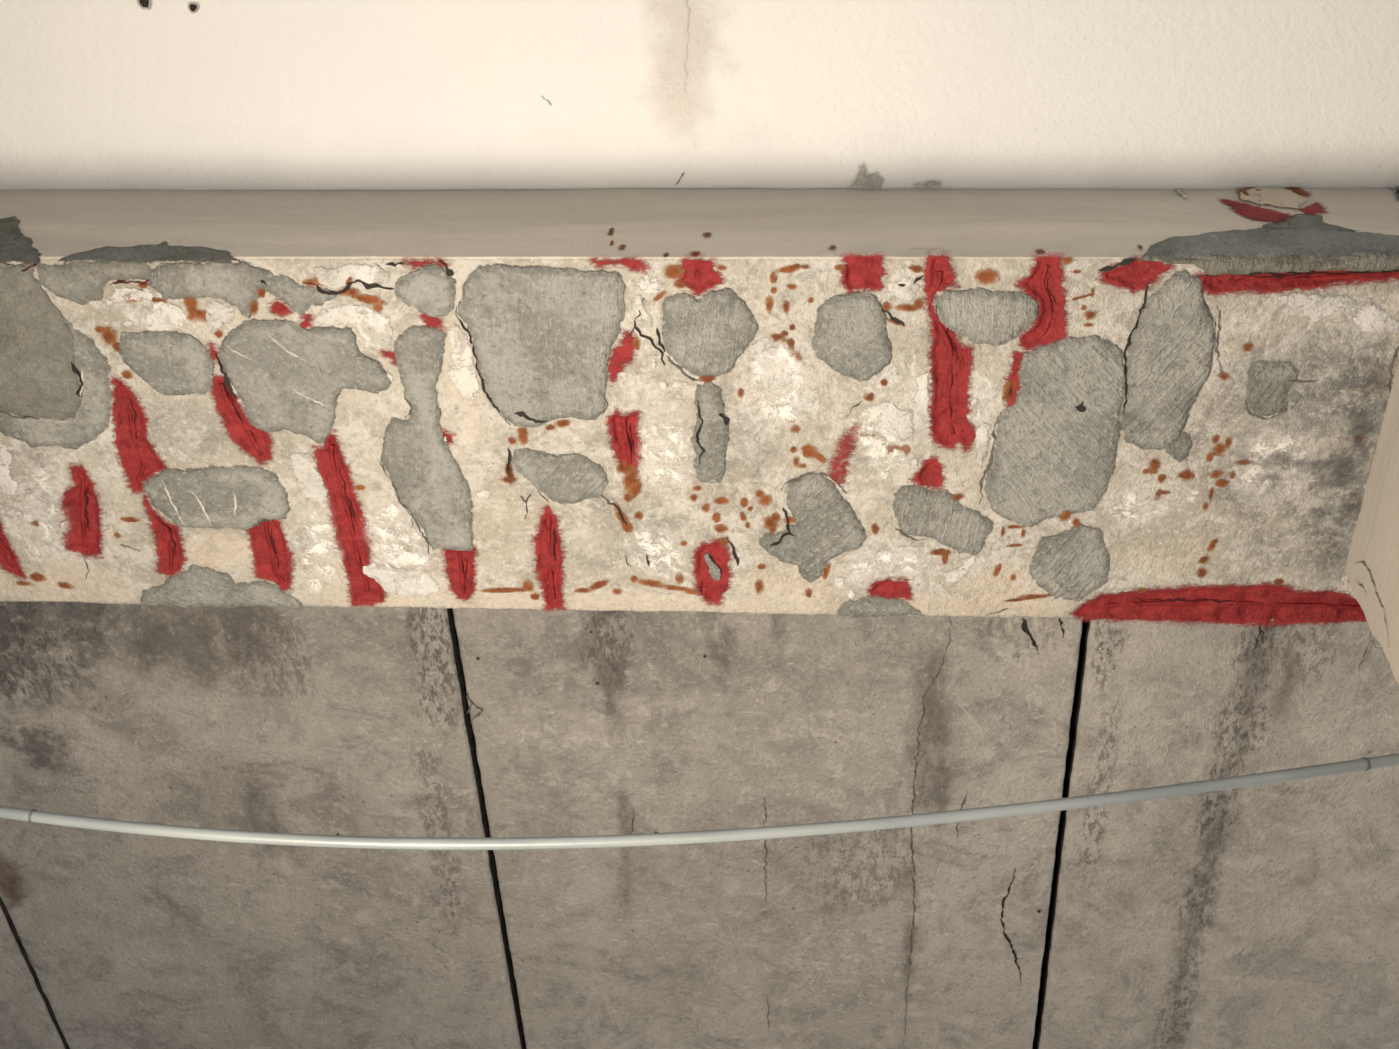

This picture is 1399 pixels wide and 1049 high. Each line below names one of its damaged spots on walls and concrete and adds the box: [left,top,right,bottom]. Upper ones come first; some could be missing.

crack [303,263,403,295]
peeling [313,263,393,350]
crack [438,261,454,276]
peeling [447,323,481,415]
peeling [290,449,328,503]
rust [790,420,826,468]
rust [1143,435,1251,509]
damp [1241,435,1316,492]
rust [690,486,794,548]
peeling [363,528,439,598]
damp [63,603,104,636]
crack [1000,868,1021,983]